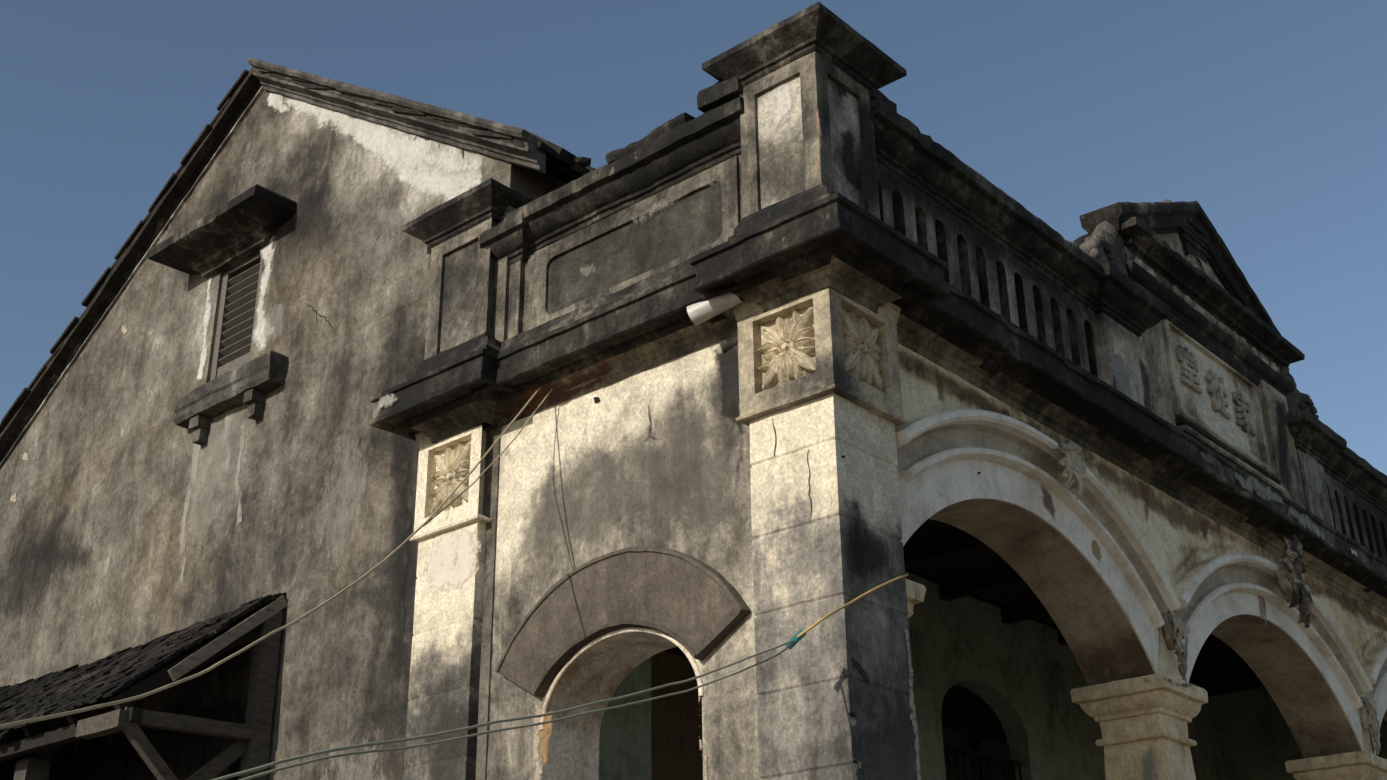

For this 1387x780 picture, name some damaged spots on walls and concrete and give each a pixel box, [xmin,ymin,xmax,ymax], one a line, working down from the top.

peeling [267,93,482,202]
damp [181,444,200,580]
damp [197,276,213,380]
damp [225,415,244,522]
damp [254,236,274,350]
spalling [378,394,397,408]
damp [716,343,741,429]
damp [935,369,1011,417]
damp [1043,488,1054,516]
damp [1108,349,1150,409]
damp [1084,457,1232,568]
damp [1260,397,1289,491]